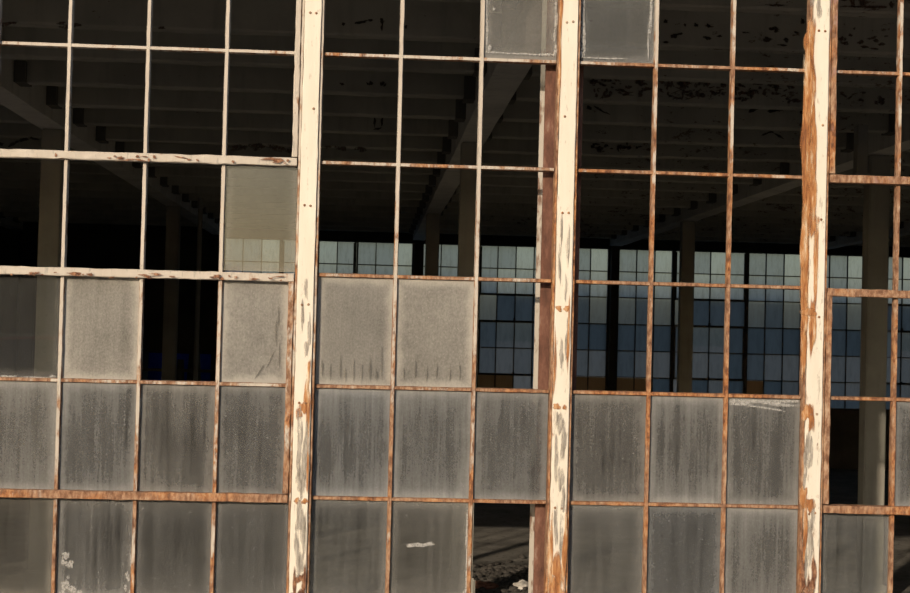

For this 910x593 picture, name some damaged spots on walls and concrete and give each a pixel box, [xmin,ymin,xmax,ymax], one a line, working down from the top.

peeling [580,0,623,59]
peeling [587,79,803,115]
rust [800,21,819,378]
peeling [558,216,570,301]
peeling [301,279,311,356]
rust [801,404,814,432]
peeling [294,407,308,575]
peeling [554,412,566,560]
rust [800,485,817,593]